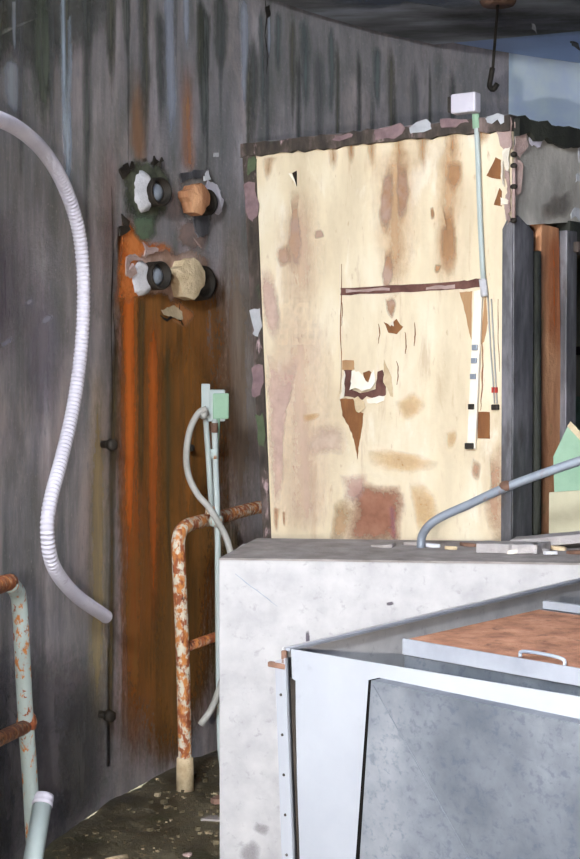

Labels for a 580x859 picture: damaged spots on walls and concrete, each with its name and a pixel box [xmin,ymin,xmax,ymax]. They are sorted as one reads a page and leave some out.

damp [0,0,227,179]
damp [242,7,339,143]
damp [371,50,397,129]
peeling [374,118,468,140]
spalling [118,156,224,278]
damp [380,141,408,285]
damp [431,160,460,271]
corrosion [109,226,235,760]
damp [334,480,401,539]
damp [0,668,17,730]
damp [31,617,103,848]
damp [0,738,26,859]